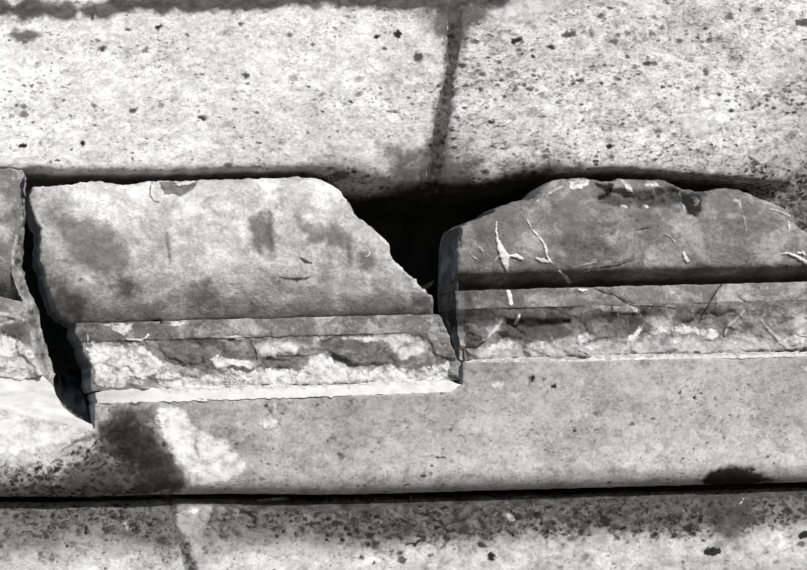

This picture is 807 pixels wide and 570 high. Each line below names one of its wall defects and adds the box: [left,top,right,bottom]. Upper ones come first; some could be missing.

damp [0,0,509,197]
crack [481,303,583,311]
crack [594,288,676,310]
crack [699,284,726,341]
crack [182,550,196,570]